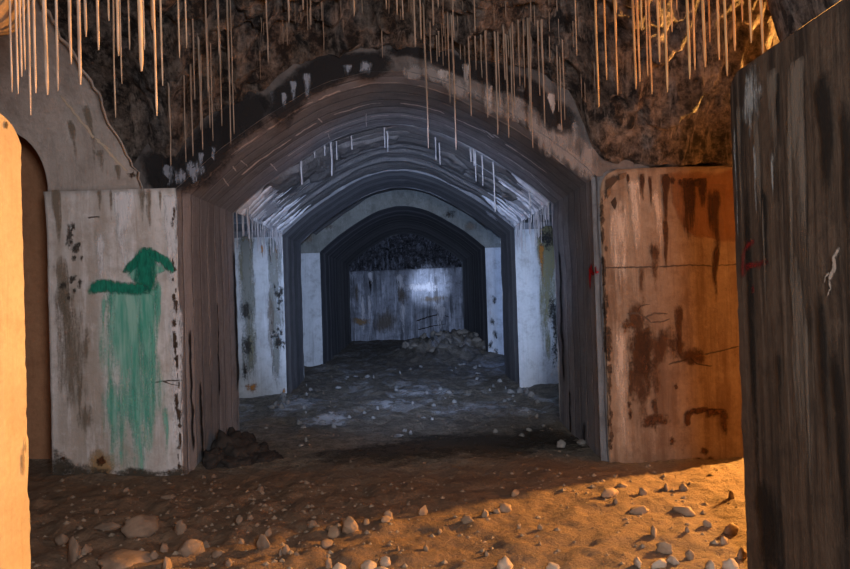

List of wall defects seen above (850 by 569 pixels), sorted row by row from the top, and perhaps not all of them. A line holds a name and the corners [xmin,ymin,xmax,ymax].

water stain [52,190,93,427]
rust [622,306,705,427]
rust [685,407,728,434]